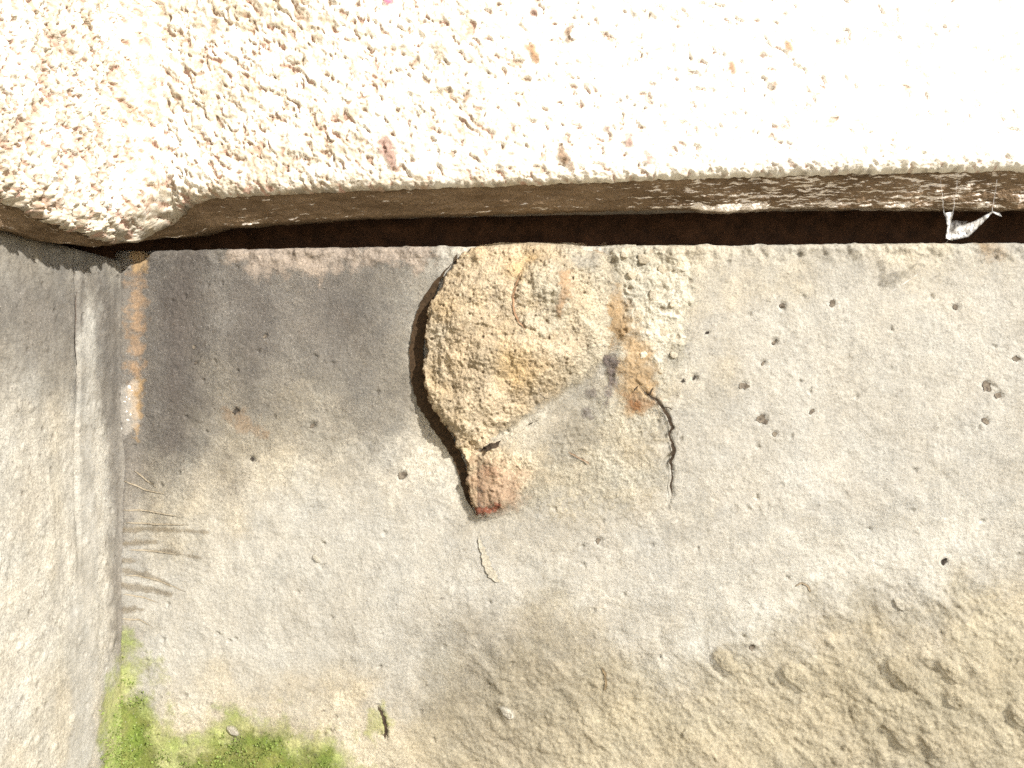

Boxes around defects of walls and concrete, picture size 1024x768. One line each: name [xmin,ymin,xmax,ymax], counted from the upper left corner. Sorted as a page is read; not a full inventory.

rust [132,251,147,272]
rust [128,381,144,430]
crack [634,382,676,500]
water stain [0,243,1024,768]